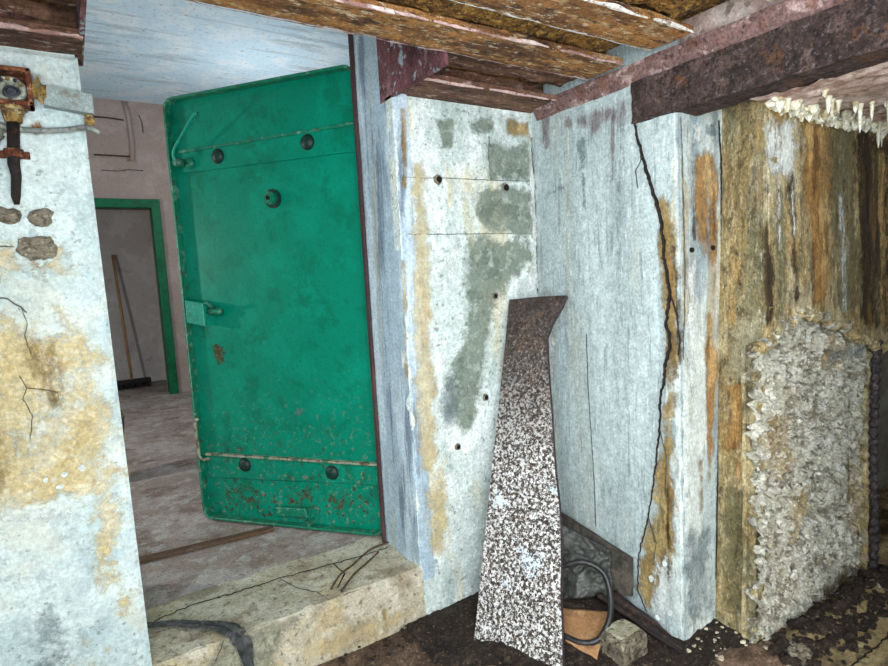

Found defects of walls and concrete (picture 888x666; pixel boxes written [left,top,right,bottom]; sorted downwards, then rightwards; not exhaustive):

crack [0,297,31,353]
crack [19,375,58,436]
water stain [0,308,125,587]
crack [154,546,388,621]
water stain [401,109,539,551]
crack [634,118,686,611]
corrosion [638,197,684,609]
corrosion [692,151,719,264]
corrosion [699,314,743,510]
spalling [686,306,888,661]
water stain [765,97,888,329]